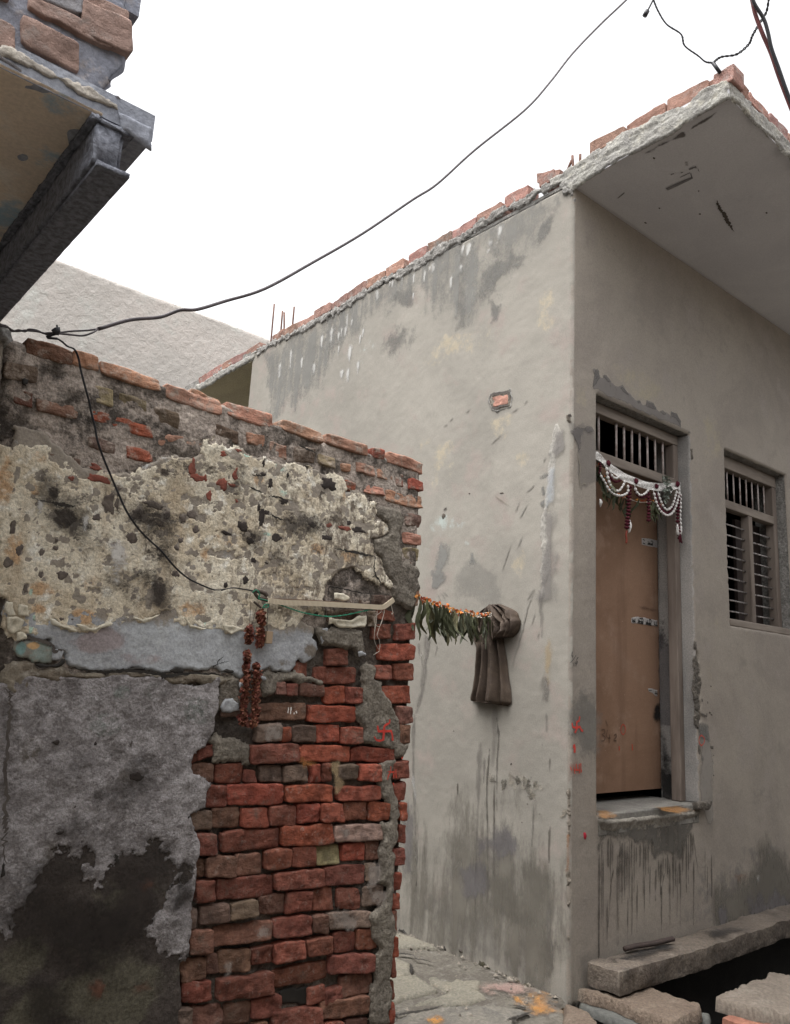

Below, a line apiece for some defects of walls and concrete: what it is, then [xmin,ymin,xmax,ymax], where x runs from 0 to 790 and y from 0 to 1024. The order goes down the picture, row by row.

leakage [266,203,542,419]
spalling [488,388,513,412]
spalling [68,463,200,550]
spalling [188,458,239,503]
spalling [221,503,282,564]
spalling [321,477,336,491]
spalling [310,521,366,540]
spalling [4,584,65,668]
flaking render [320,615,367,644]
flaking render [220,682,243,713]
leakage [598,723,790,958]
leakage [410,749,570,1013]